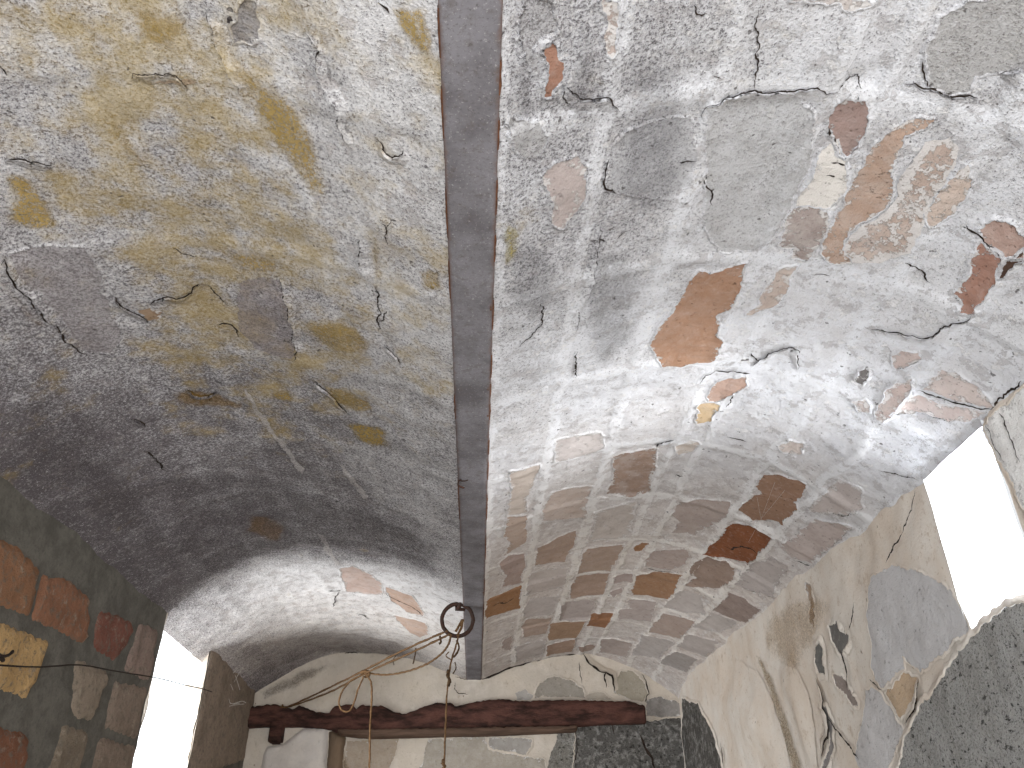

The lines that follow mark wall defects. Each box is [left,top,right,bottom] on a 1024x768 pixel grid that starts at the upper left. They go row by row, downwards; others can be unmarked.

leakage [243,71,321,192]
leakage [396,11,430,51]
crack [560,87,620,115]
crack [701,12,862,119]
crack [901,62,978,110]
leakage [8,176,51,228]
peeling [601,94,976,369]
flaking render [949,214,1024,318]
crack [871,317,977,346]
flaking render [693,374,749,424]
peeling [849,348,1024,512]
flaking render [484,430,866,768]